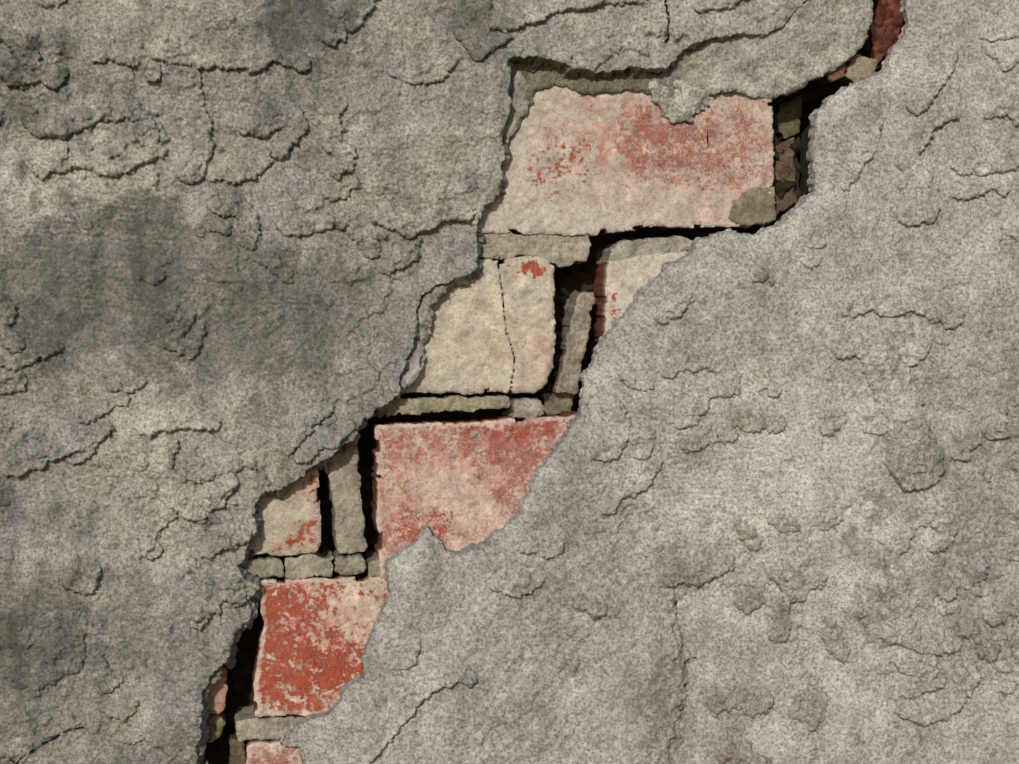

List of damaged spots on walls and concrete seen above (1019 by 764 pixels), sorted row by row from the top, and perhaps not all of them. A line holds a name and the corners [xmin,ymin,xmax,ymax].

crack [663,0,671,42]
flaking render [502,0,874,197]
crack [857,30,884,72]
flaking render [392,281,456,403]
peeling [506,260,549,285]
crack [357,82,849,554]
peeling [272,474,318,552]
crack [316,468,337,553]
peeling [381,481,478,553]
peeling [382,419,567,516]
crack [203,601,262,764]
peeling [232,581,387,714]